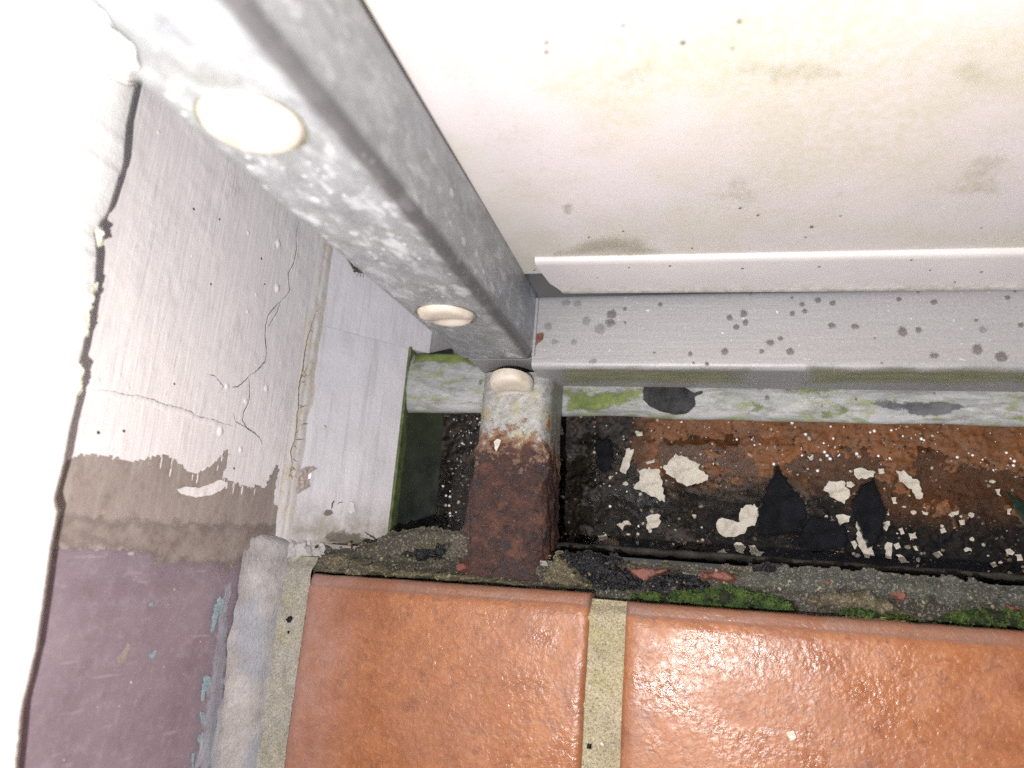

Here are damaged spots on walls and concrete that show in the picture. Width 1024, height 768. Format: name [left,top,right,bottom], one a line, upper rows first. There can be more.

crack [98,222,299,442]
peeling [53,450,279,552]
peeling [617,514,661,535]
peeling [609,448,708,502]
peeling [716,504,764,556]
peeling [823,468,945,563]